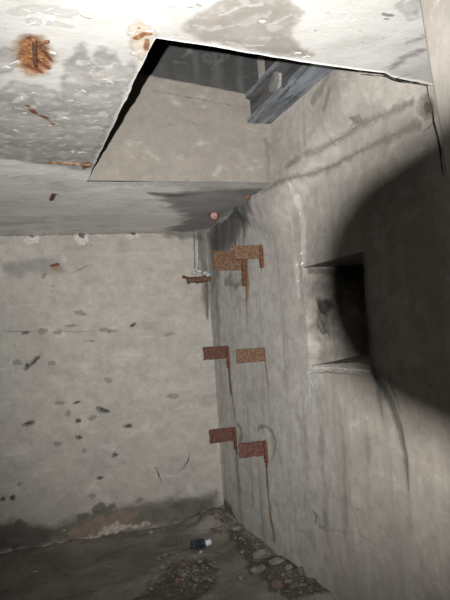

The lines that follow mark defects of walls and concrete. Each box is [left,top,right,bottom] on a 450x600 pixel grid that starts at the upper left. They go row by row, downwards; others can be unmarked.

rust [12,35,56,75]
spalling [126,22,156,60]
crack [250,71,443,197]
leakage [194,231,209,319]
leakage [0,494,216,554]